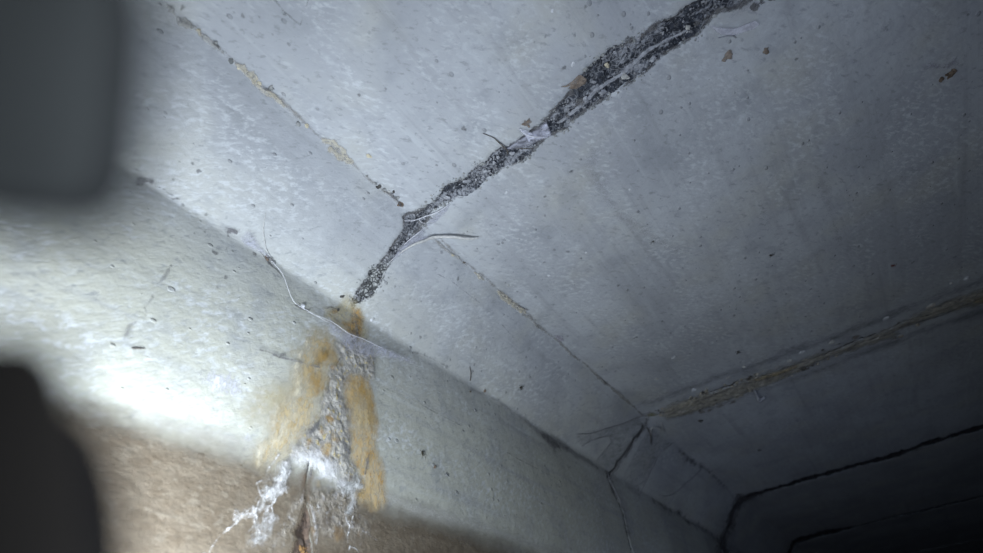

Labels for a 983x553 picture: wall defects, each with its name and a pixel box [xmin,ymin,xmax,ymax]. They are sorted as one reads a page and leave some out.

crack [262,0,771,390]
corrosion [328,301,366,344]
corrosion [259,336,338,458]
leakage [98,341,508,553]
corrosion [343,374,385,508]
crack [606,412,665,545]